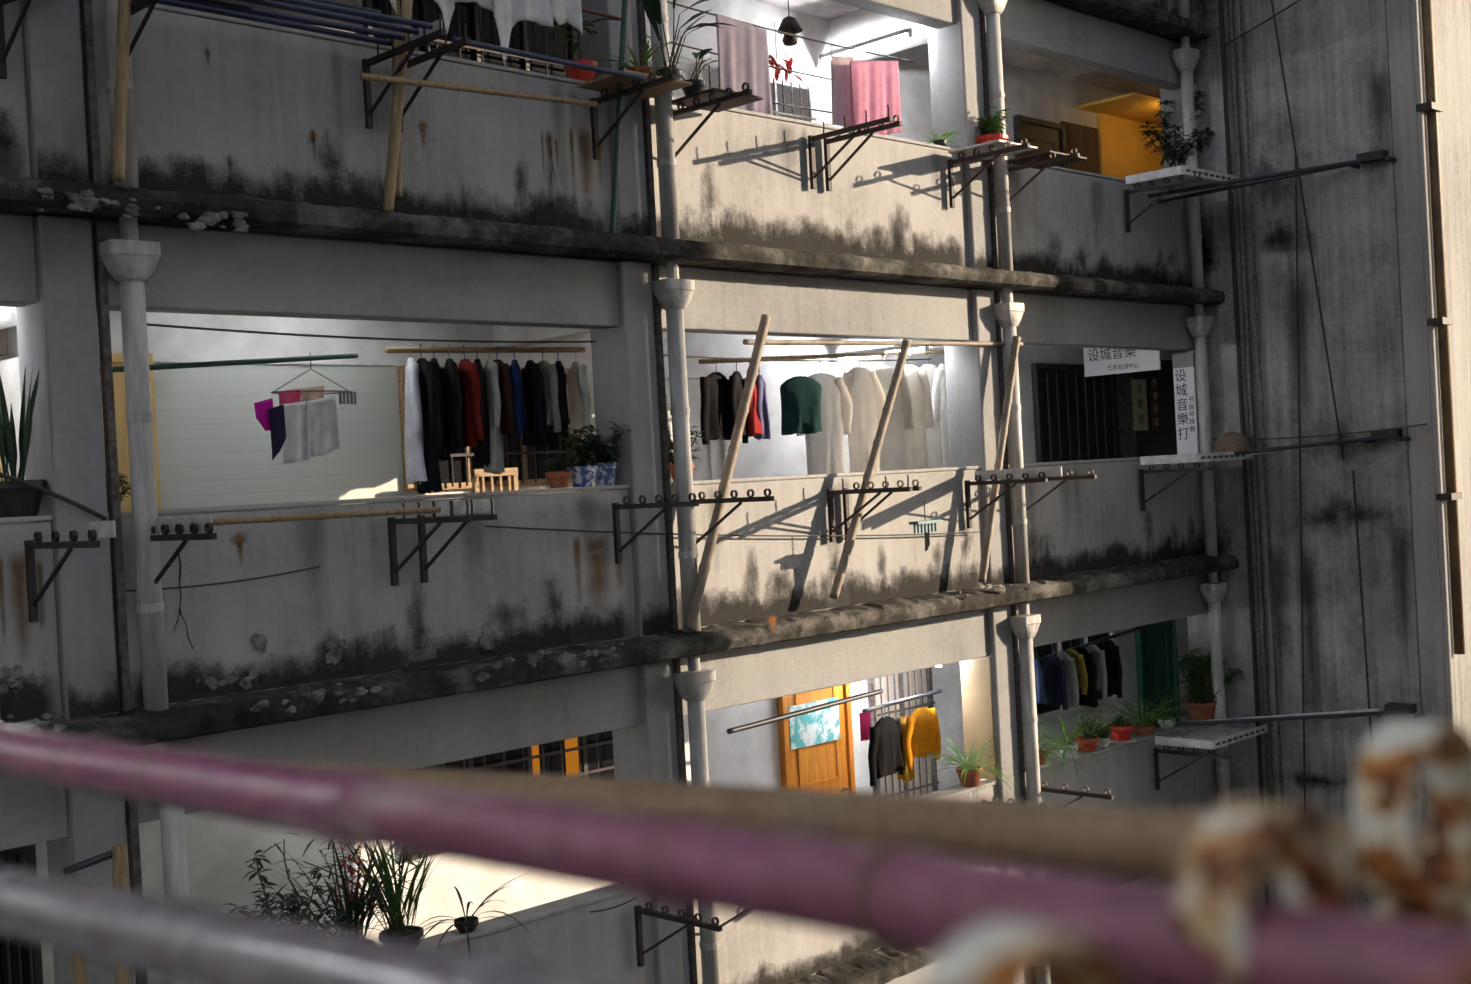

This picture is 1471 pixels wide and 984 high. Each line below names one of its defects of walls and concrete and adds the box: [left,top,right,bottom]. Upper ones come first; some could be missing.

leakage [1201,219,1215,284]
leakage [1265,226,1293,251]